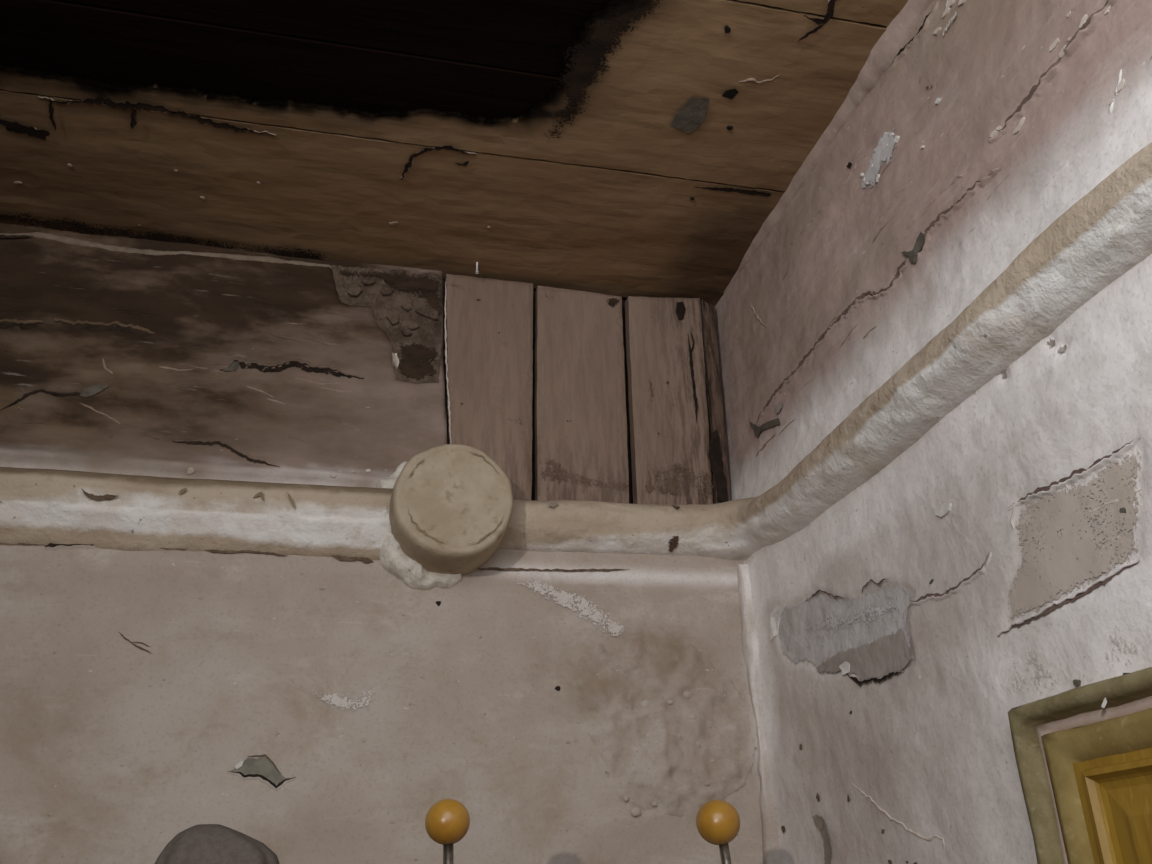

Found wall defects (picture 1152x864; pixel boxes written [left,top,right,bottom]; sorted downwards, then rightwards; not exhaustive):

peeling [933,0,966,35]
crack [400,146,476,179]
crack [755,0,1118,425]
crack [0,318,154,335]
spalling [0,232,444,383]
crack [0,359,120,424]
crack [159,357,364,405]
peeling [1008,449,1142,621]
spalling [769,579,913,686]
spalling [227,752,296,792]